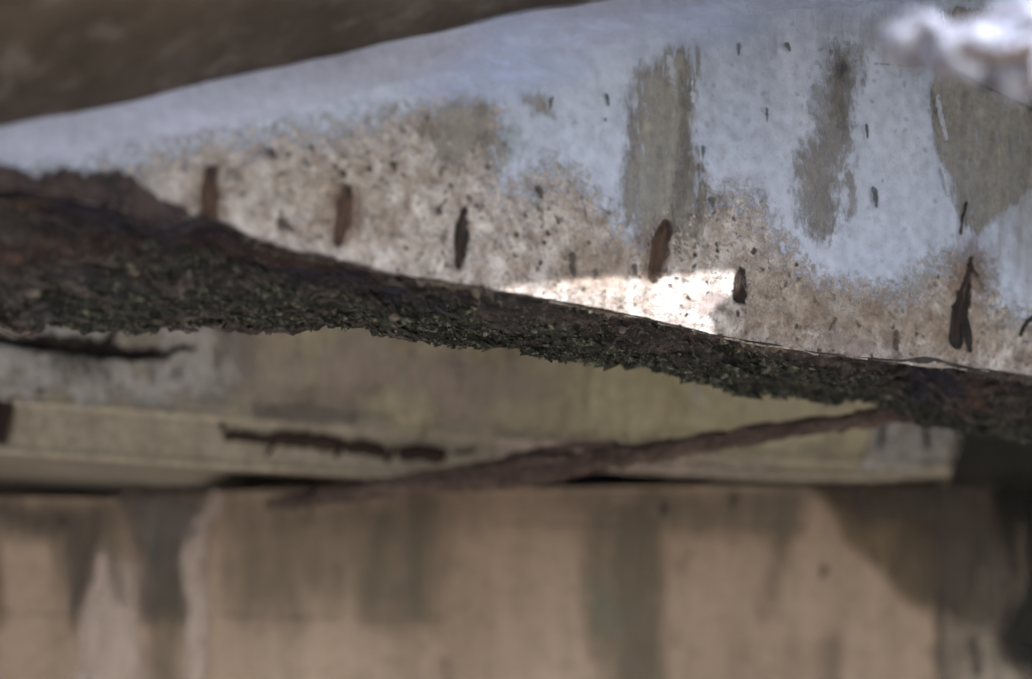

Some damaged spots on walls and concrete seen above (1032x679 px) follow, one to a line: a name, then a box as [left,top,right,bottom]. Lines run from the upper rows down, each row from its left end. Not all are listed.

spalling [0,75,1032,377]
damp [623,45,708,254]
damp [796,42,866,240]
corrosion [0,401,14,445]
crack [0,331,196,365]
spalling [0,323,476,465]
corrosion [265,406,919,510]
damp [0,487,224,679]
damp [813,479,1032,679]